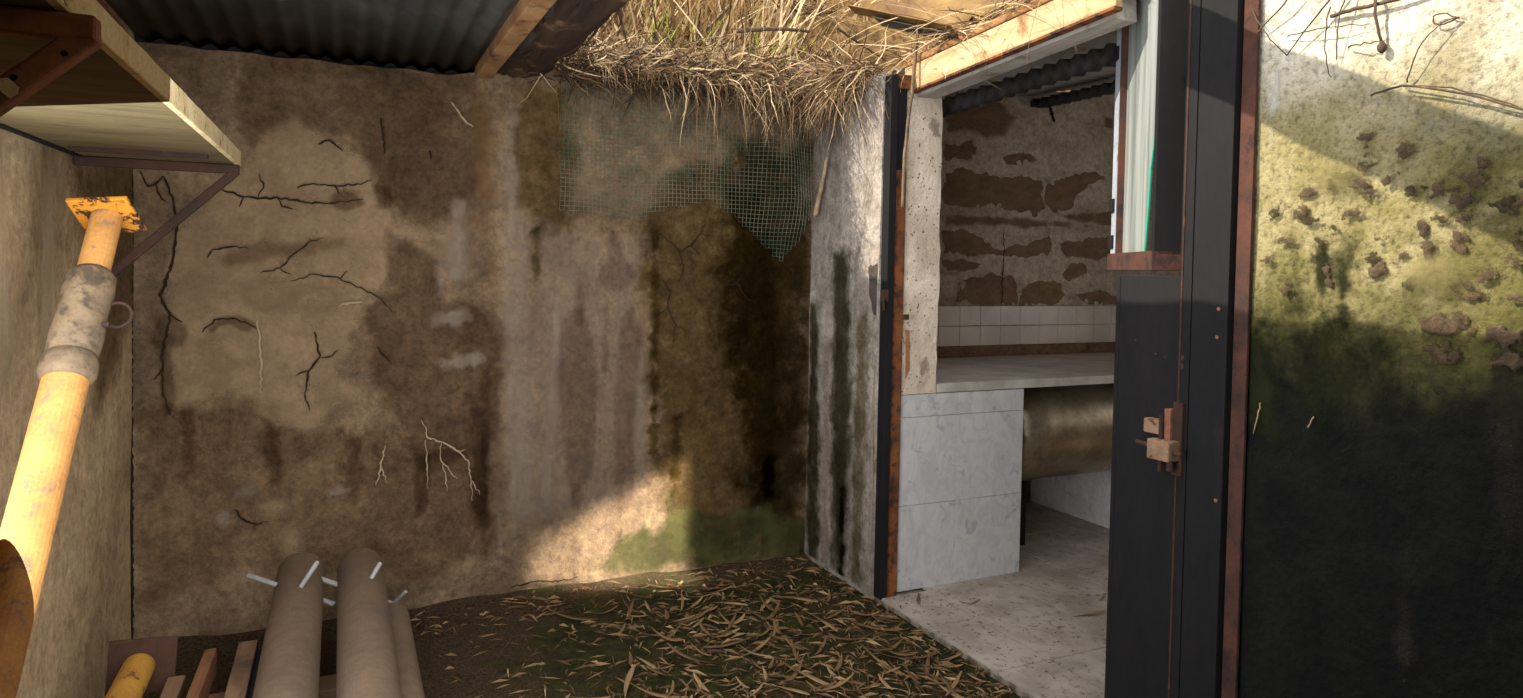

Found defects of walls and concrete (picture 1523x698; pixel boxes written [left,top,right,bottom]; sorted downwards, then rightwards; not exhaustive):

crack [130,118,393,639]
leakage [715,139,851,576]
peeling [942,139,1104,217]
peeling [941,229,1116,306]